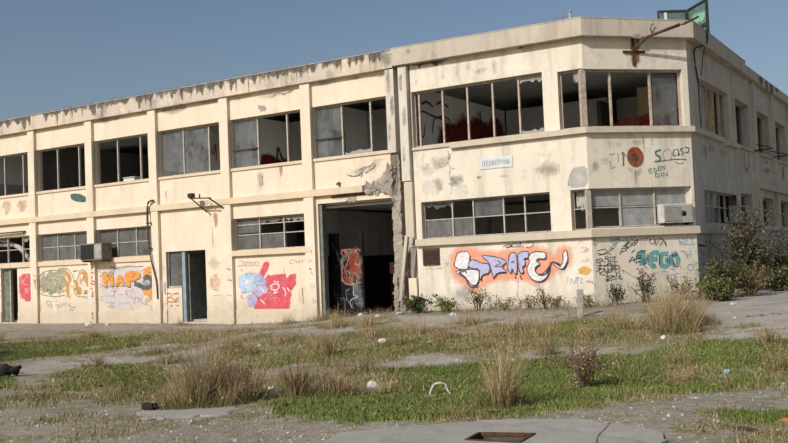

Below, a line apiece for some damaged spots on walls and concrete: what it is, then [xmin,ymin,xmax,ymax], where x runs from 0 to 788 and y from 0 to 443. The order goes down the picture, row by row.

water stain [0,116,30,130]
water stain [45,52,384,124]
peeling [568,166,587,188]
spalling [331,151,410,312]